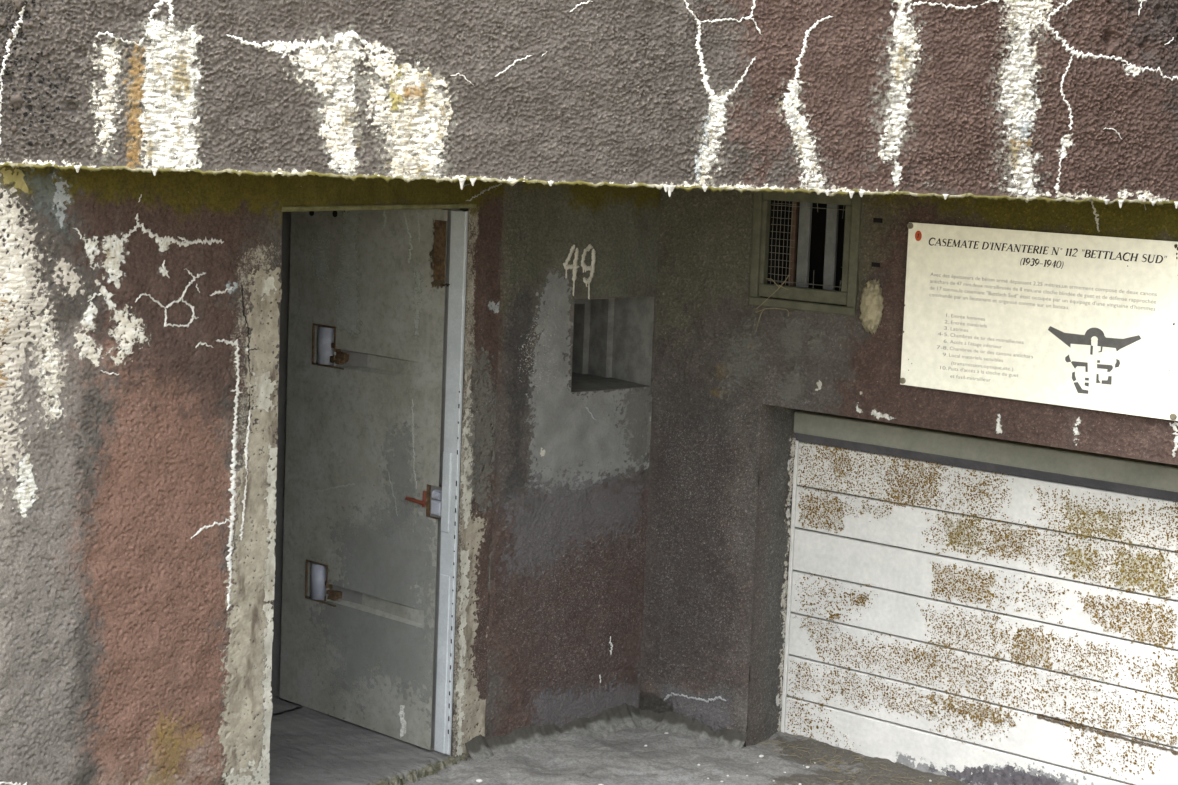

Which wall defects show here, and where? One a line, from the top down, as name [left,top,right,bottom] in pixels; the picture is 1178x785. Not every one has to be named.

crack [684,0,761,105]
crack [783,15,833,107]
crack [910,0,1011,10]
crack [1032,0,1178,193]
rust [426,220,450,289]
water stain [0,0,1178,518]
crack [121,194,257,610]
peeling [214,263,282,785]
water stain [492,463,648,595]
rust [789,442,1178,779]
water stain [527,670,640,728]